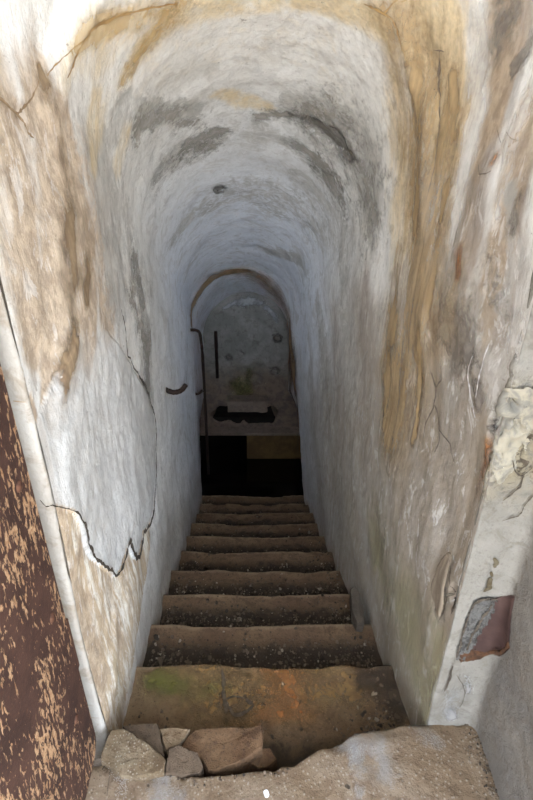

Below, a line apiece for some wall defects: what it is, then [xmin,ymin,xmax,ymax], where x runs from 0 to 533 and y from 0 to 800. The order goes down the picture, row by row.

leakage [37,62,53,96]
crack [0,3,177,138]
leakage [131,105,230,160]
leakage [253,94,381,240]
leakage [451,62,484,245]
leakage [62,190,91,309]
leakage [58,323,80,397]
crack [40,309,157,577]
crack [422,366,454,461]
spalling [490,387,533,484]
spalling [456,558,515,663]